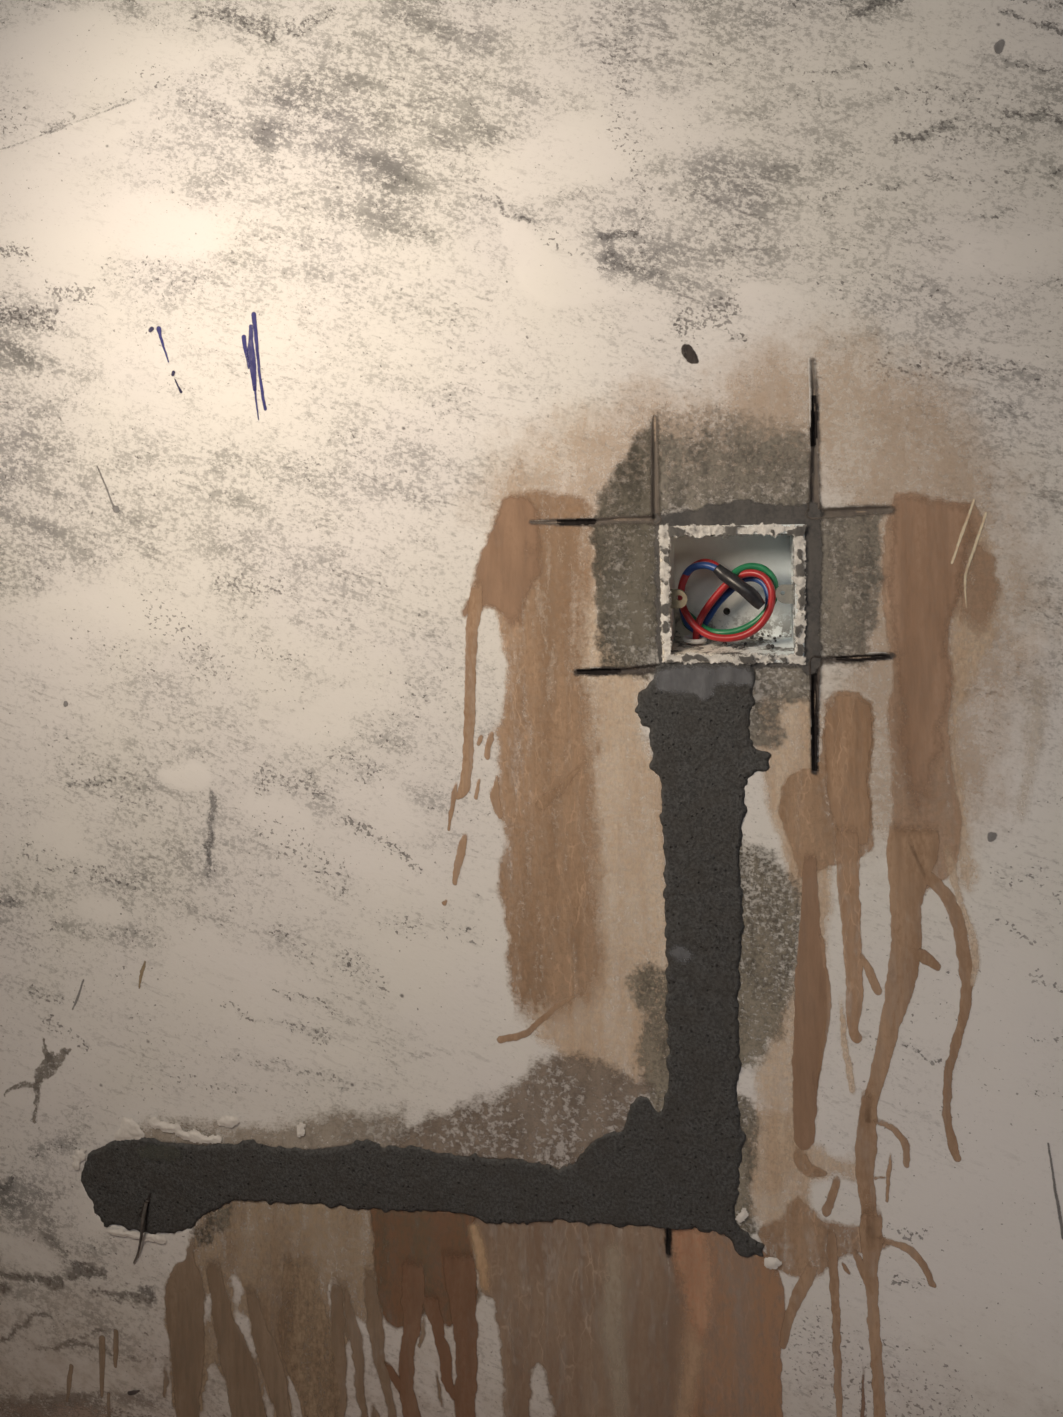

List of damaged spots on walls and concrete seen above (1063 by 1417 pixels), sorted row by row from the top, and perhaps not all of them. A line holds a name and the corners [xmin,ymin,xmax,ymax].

damp [163,1200,382,1417]
damp [448,357,1024,1417]